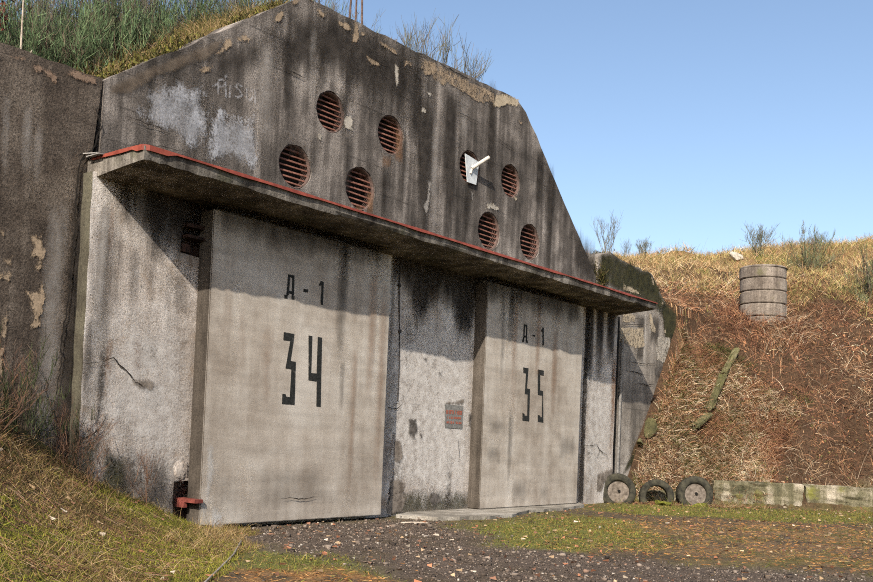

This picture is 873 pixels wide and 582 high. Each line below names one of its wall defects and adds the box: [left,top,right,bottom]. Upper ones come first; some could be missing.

peeling [34,65,57,83]
peeling [68,70,97,84]
peeling [395,59,519,107]
water stain [444,98,456,238]
water stain [487,90,496,203]
water stain [536,154,554,254]
peeling [31,235,45,270]
crack [54,82,104,413]
water stain [224,209,382,257]
peeling [26,285,45,328]
crack [86,357,143,386]
water stain [393,256,615,502]